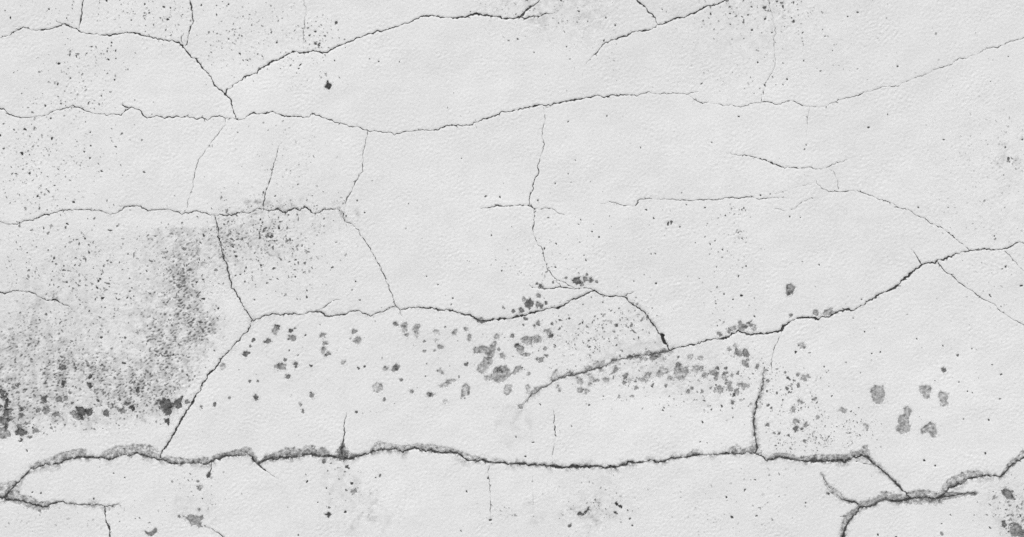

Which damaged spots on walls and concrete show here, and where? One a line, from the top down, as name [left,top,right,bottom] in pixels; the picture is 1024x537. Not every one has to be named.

crack [0,0,725,203]
crack [0,125,1024,537]